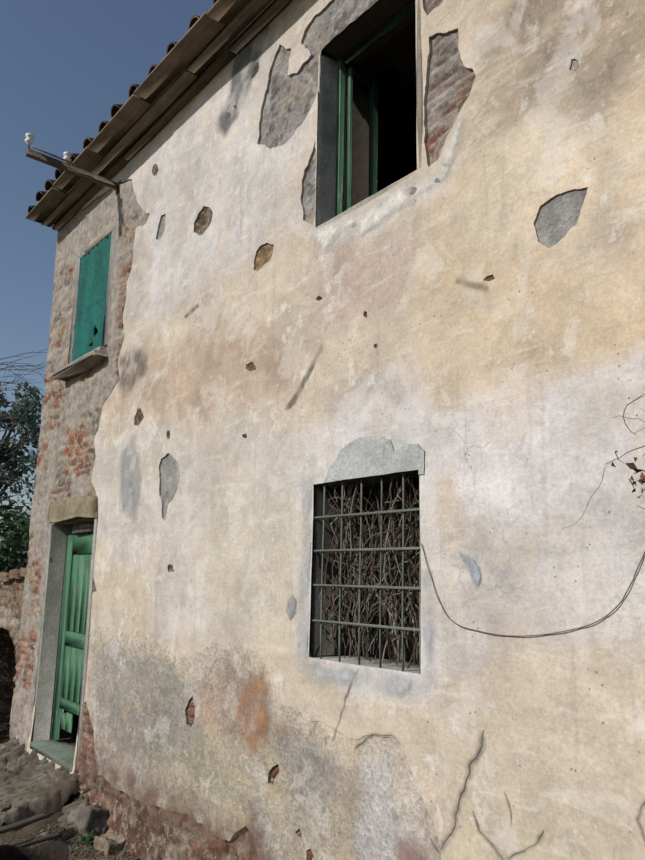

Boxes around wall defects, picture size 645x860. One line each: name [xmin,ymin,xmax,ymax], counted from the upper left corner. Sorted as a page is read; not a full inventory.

flaking render [422,0,443,15]
flaking render [251,0,378,149]
flaking render [423,28,476,167]
spalling [194,206,213,235]
flaking render [533,187,588,248]
spalling [254,243,274,271]
flaking render [159,453,180,521]
flaking render [66,624,442,860]
crack [431,730,544,860]